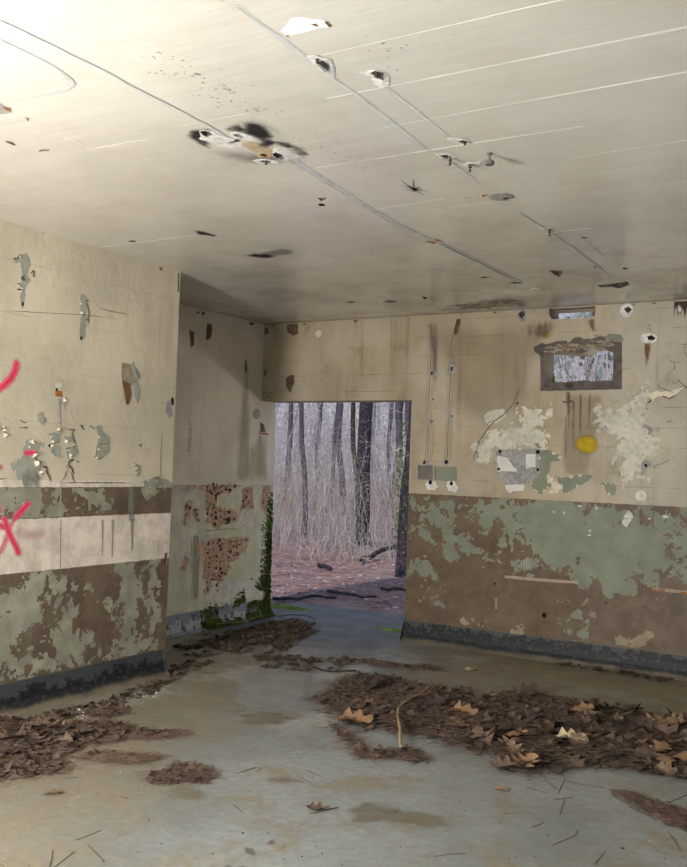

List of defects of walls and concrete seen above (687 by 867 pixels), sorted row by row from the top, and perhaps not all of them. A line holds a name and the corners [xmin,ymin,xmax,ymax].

spalling [199,128,374,169]
peeling [13,253,34,308]
peeling [134,462,173,501]
peeling [406,334,687,642]
peeling [179,483,271,604]
peeling [0,552,168,682]
peeling [614,630,654,648]